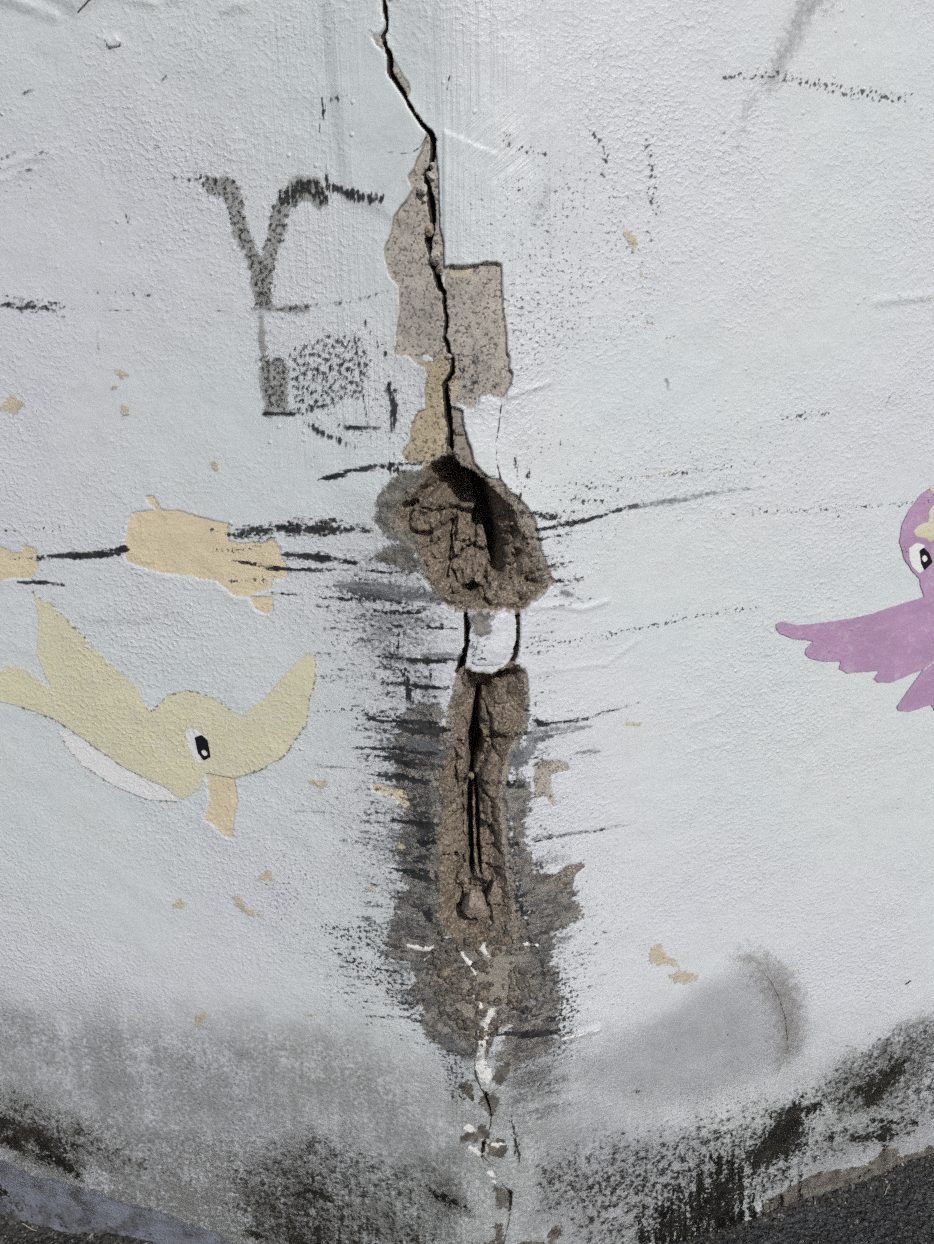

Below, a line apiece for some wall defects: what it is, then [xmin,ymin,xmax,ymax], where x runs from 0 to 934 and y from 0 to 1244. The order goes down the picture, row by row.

crack [371,0,458,463]
spalling [369,135,552,638]
crack [495,405,503,479]
peeling [125,496,287,614]
water stain [377,624,458,694]
crack [455,601,522,676]
spalling [352,661,597,1160]
water stain [0,1091,191,1185]
water stain [217,1138,471,1244]
crack [474,1007,513,1244]
peeling [484,1184,510,1244]
water stain [537,1021,934,1244]